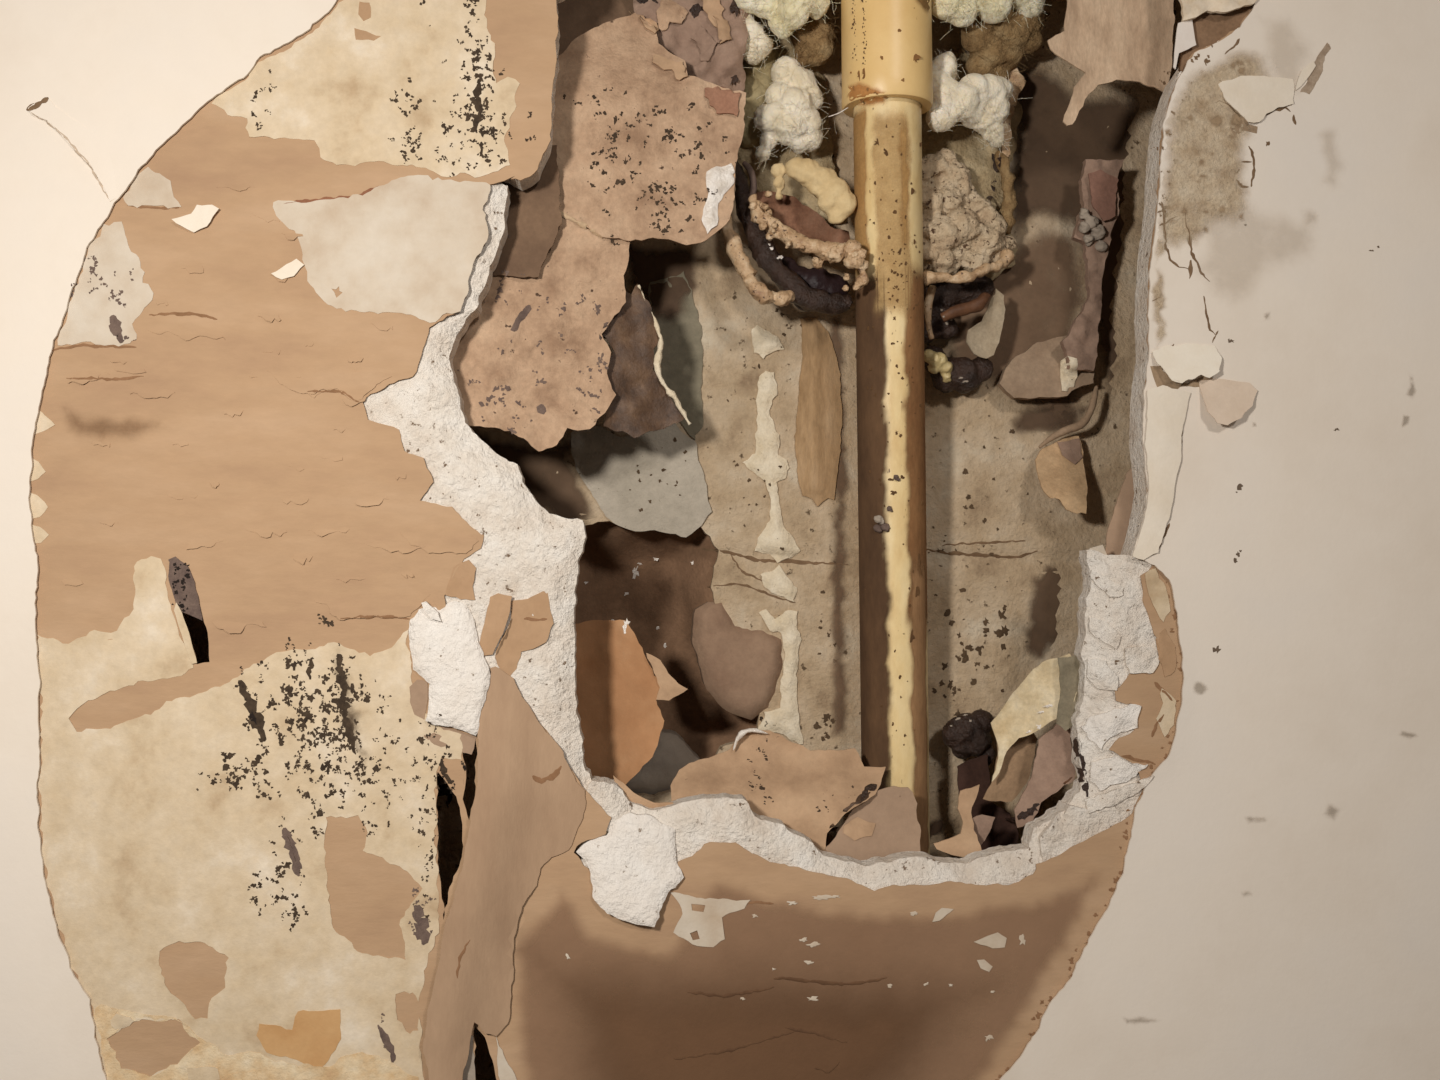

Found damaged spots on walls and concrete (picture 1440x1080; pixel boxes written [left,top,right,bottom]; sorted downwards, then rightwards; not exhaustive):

damp [250,69,277,130]
damp [388,0,536,177]
damp [953,235,1081,380]
damp [1014,72,1137,380]
damp [1153,276,1164,339]
damp [1151,45,1263,253]
peeling [1218,76,1294,136]
peeling [26,0,565,1080]
peeling [472,0,1257,1080]
damp [196,637,467,945]